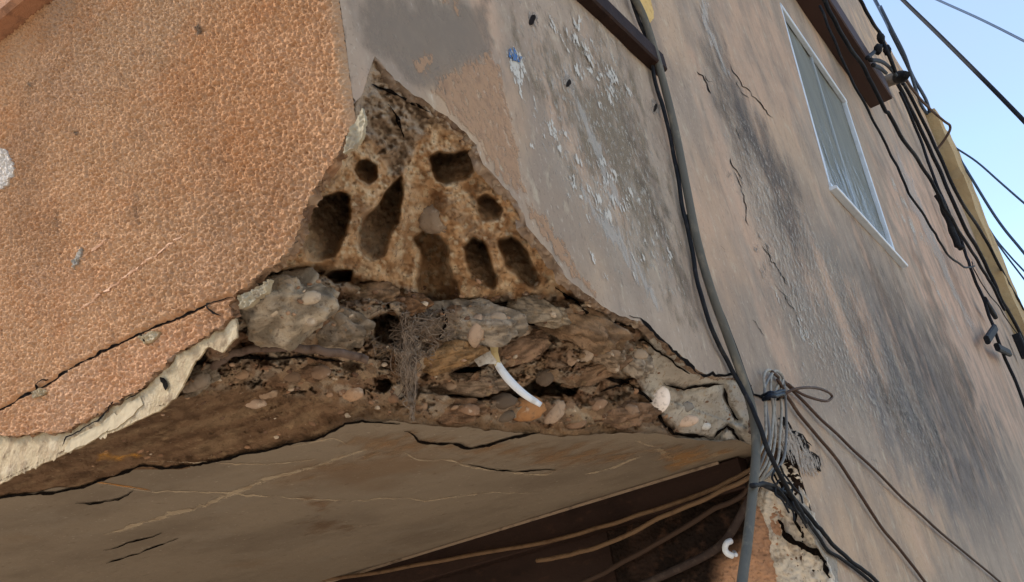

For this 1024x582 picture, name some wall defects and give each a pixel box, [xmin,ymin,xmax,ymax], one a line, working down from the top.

crack [697,68,773,118]
water stain [542,42,676,271]
crack [730,129,748,224]
water stain [732,83,797,247]
spalling [0,46,751,497]
crack [0,297,233,410]
crack [106,533,176,564]
crack [0,420,556,505]
spalling [749,414,839,582]